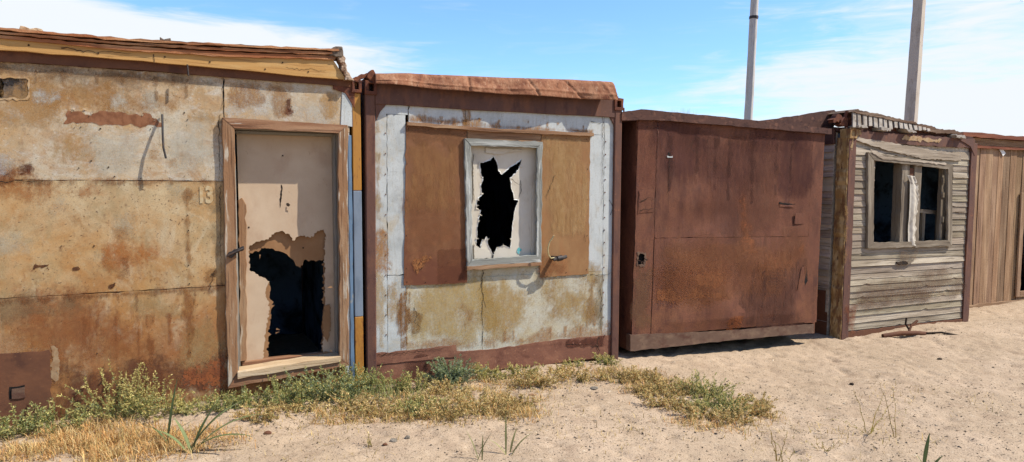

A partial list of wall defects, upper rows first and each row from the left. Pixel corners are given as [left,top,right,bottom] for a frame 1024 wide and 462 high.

peeling [64,93,161,128]
corrosion [51,290,228,420]
corrosion [376,230,520,350]
corrosion [546,268,604,327]